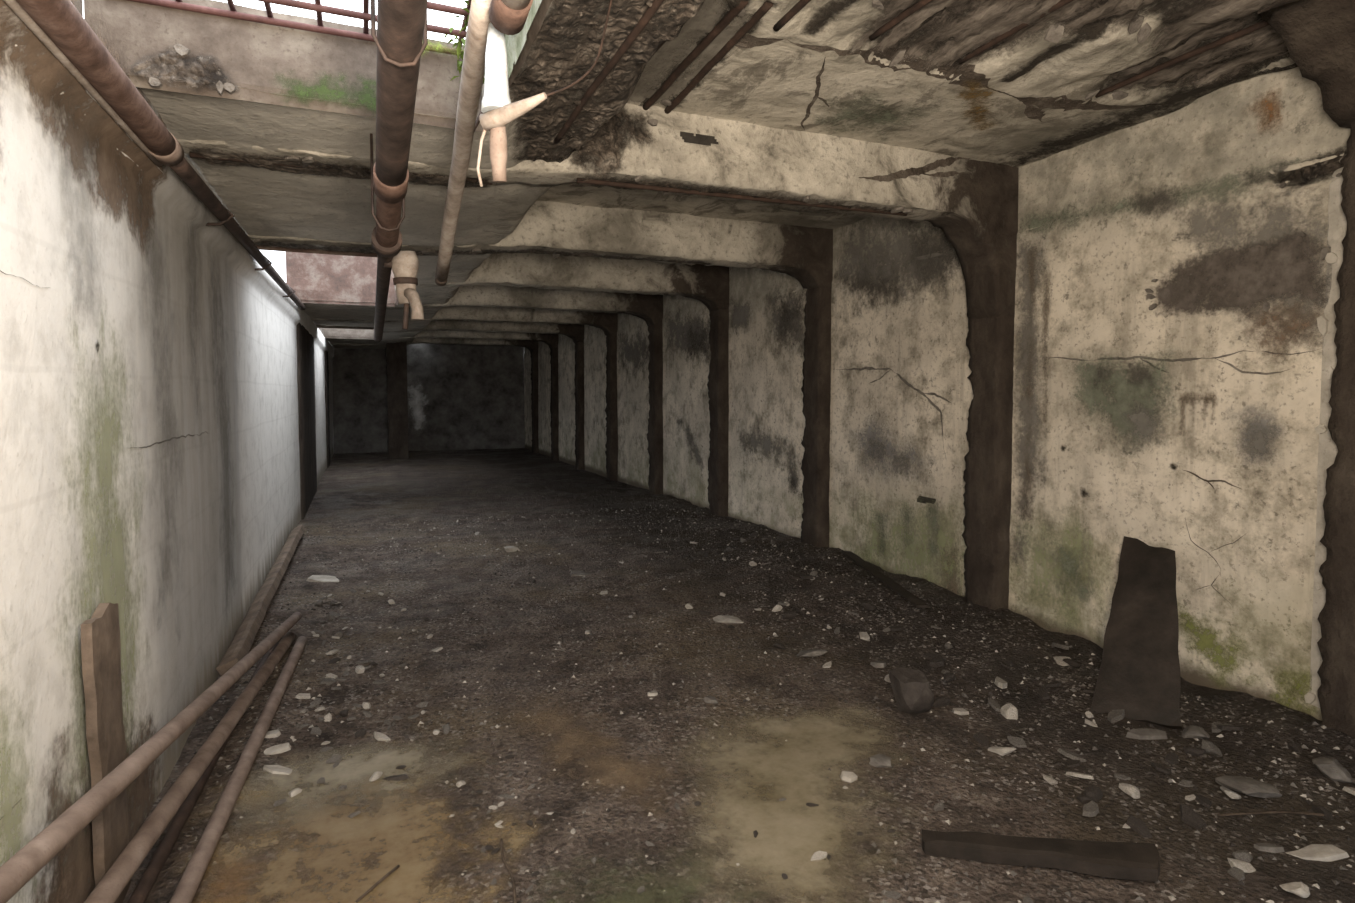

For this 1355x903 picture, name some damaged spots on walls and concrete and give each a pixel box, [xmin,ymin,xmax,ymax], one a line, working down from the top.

spalling [505,0,1289,216]
crack [735,34,1165,128]
crack [1042,348,1323,375]
crack [836,367,951,458]
leakage [81,385,155,757]
leakage [47,650,89,824]
leakage [0,721,24,867]
leakage [127,760,160,842]
leakage [33,821,95,903]